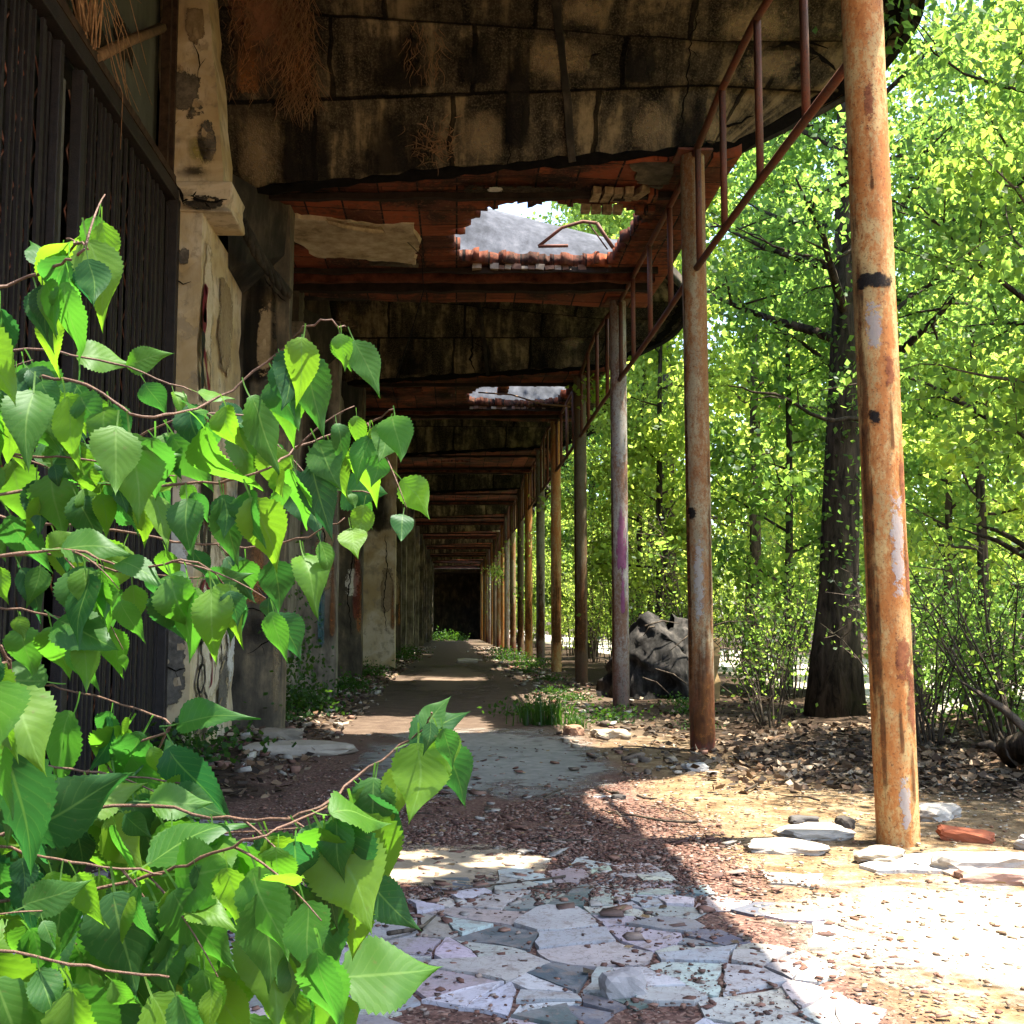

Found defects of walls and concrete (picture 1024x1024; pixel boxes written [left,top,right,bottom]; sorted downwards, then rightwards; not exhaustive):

leakage [374,40,427,89]
leakage [469,43,588,155]
crack [679,14,698,135]
leakage [676,105,719,146]
rust [864,81,875,130]
peeling [865,301,882,348]
rust [885,356,895,389]
rust [890,402,905,501]
rust [685,406,715,744]
rust [855,263,887,786]
peeling [890,492,905,596]
rust [895,634,916,803]